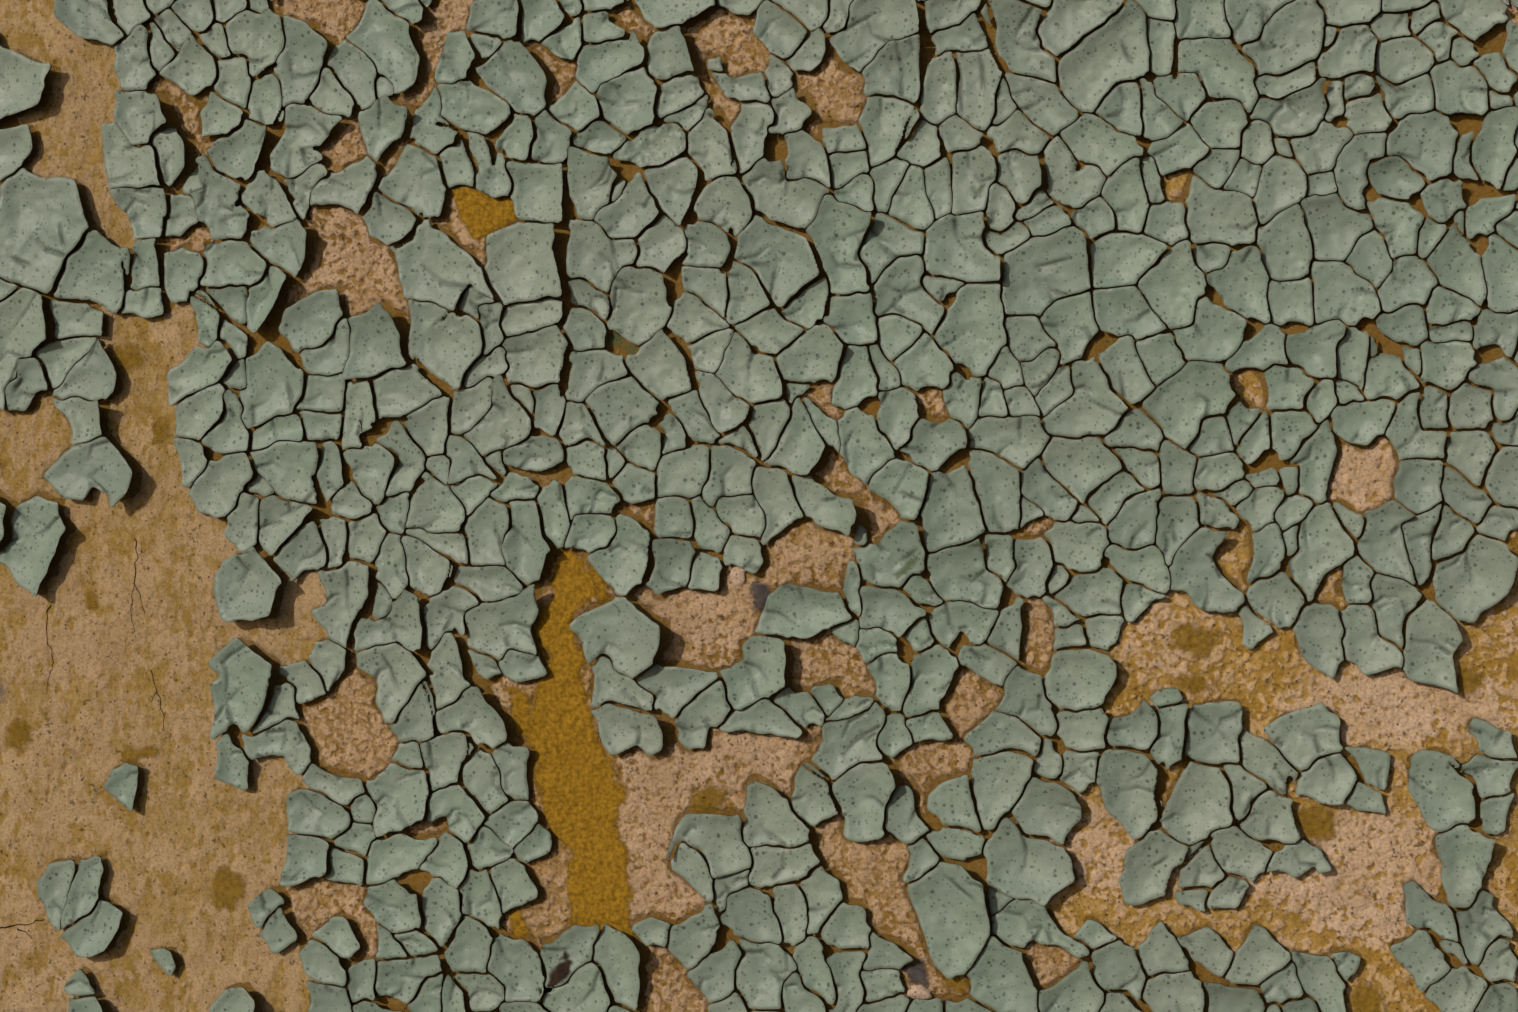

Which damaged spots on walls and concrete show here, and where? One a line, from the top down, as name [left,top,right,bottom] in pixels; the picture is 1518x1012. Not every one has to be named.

flaking render [0,0,659,1012]
peeling [399,0,1518,1012]
crack [130,538,145,632]
crack [46,605,54,693]
crack [150,670,164,729]
crack [0,919,45,937]